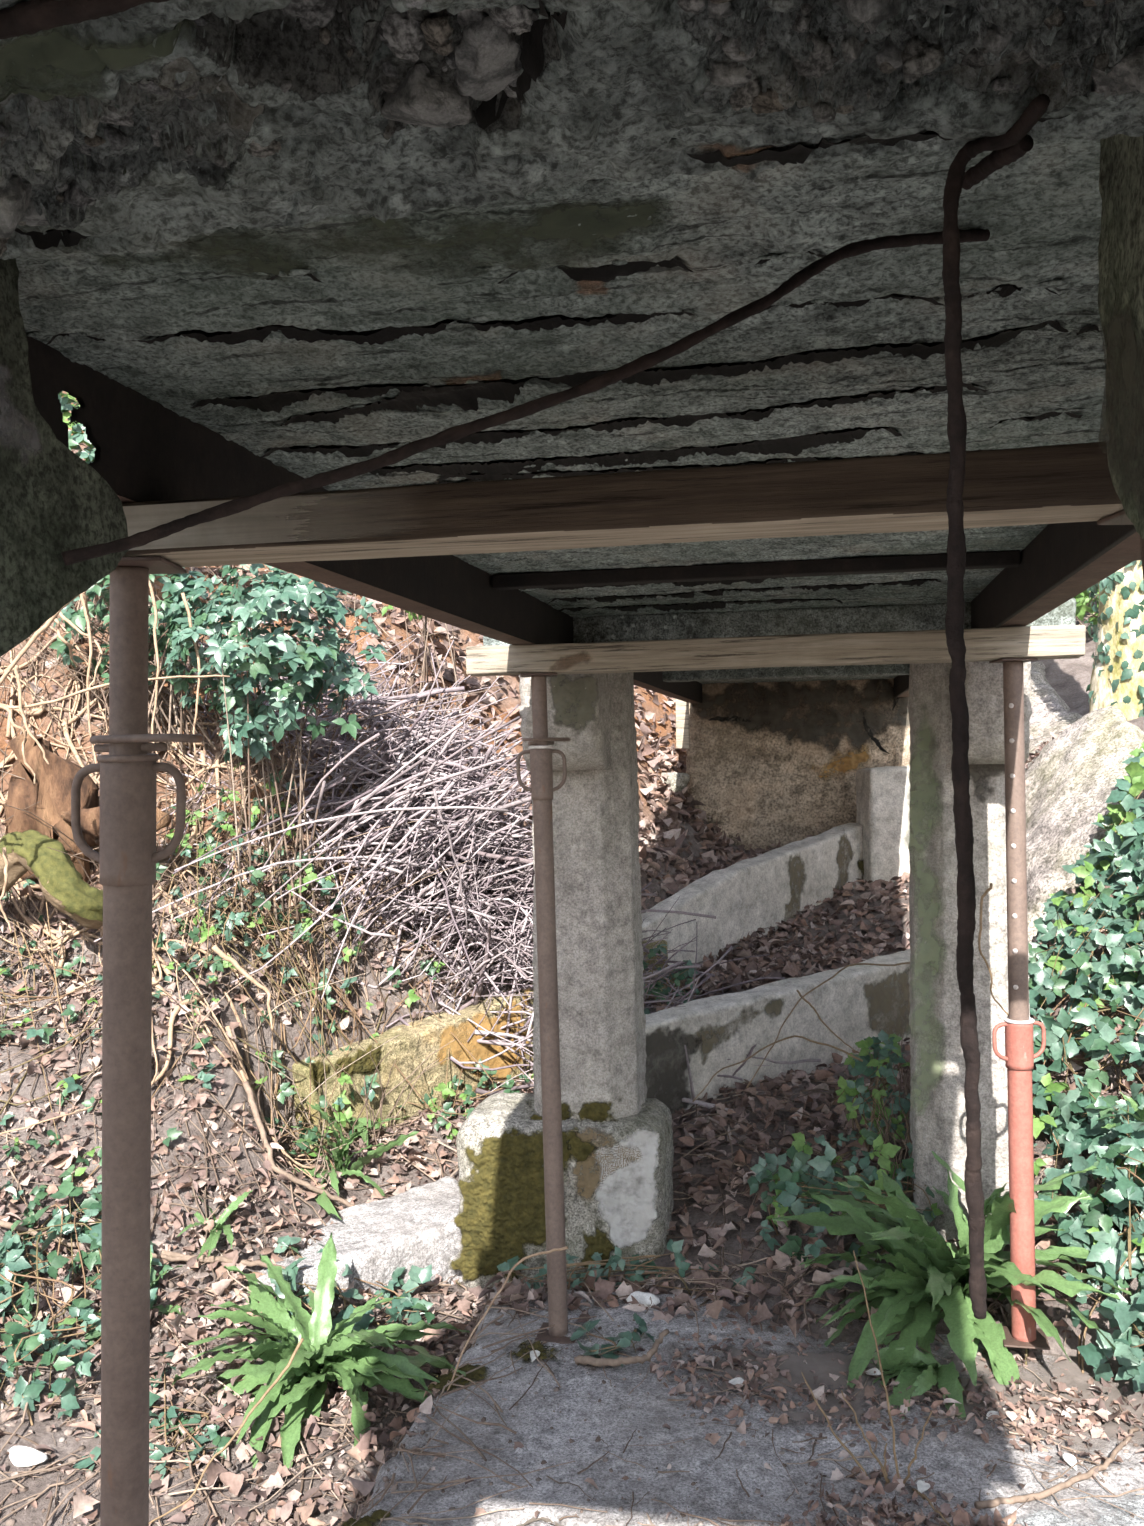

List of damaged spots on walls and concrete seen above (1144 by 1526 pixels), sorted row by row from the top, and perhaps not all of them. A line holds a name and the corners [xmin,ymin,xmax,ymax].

water stain [0,19,191,102]
spalling [0,0,561,257]
crack [660,127,982,167]
crack [1039,90,1128,122]
crack [26,258,695,345]
water stain [158,200,665,280]
crack [755,251,826,265]
spalling [61,231,944,566]
crack [191,280,1101,487]
spalling [677,0,1144,1319]
peeling [595,1130,659,1248]